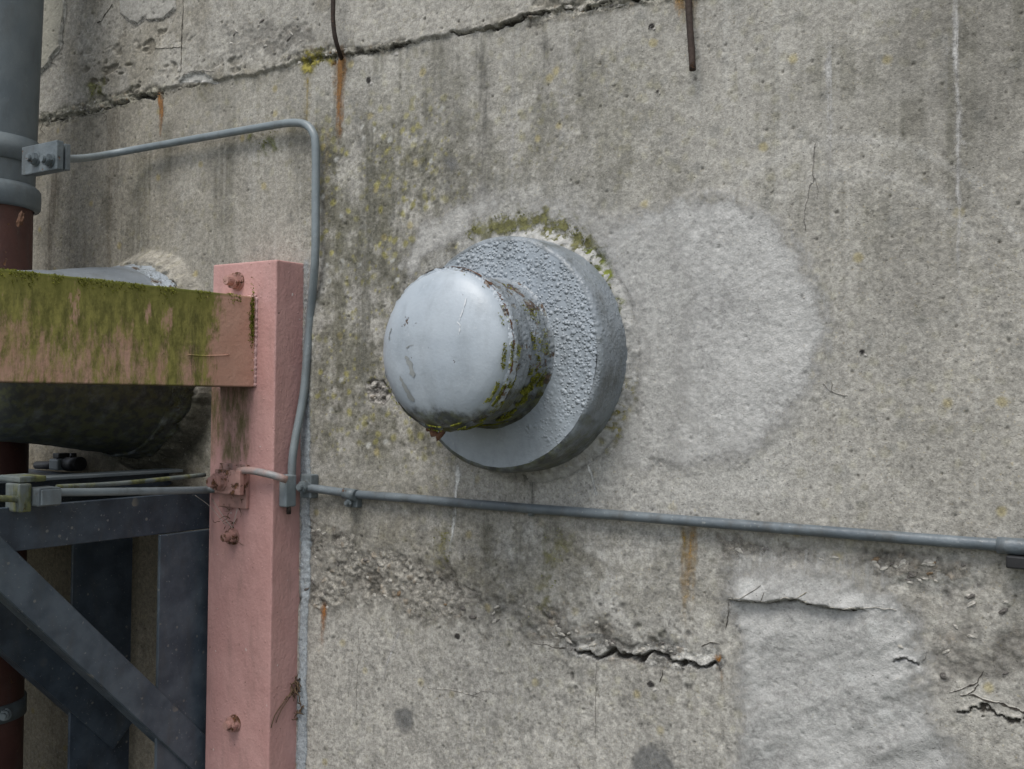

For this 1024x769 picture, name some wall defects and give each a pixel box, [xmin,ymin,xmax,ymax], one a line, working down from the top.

crack [41,5,67,74]
crack [97,0,215,88]
crack [311,0,652,63]
crack [96,94,157,120]
corrosion [337,53,346,133]
spalling [299,520,481,628]
crack [530,585,894,738]
crack [949,671,1024,725]